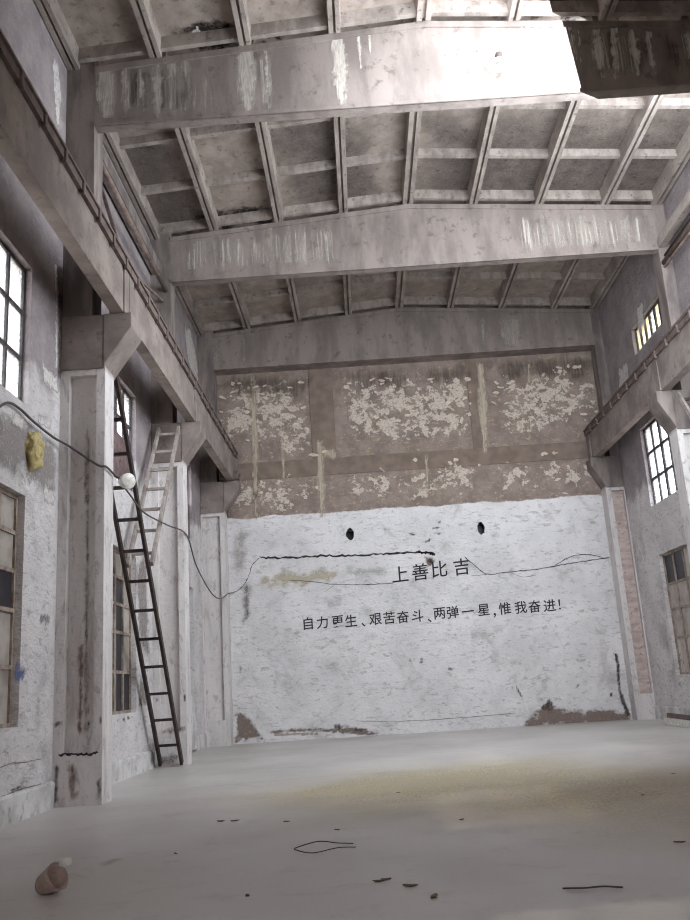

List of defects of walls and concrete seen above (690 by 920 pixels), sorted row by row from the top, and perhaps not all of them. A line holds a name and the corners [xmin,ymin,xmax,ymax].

peeling [219,379,327,458]
peeling [343,372,471,444]
peeling [491,364,598,433]
peeling [348,458,480,501]
peeling [495,451,592,498]
flaking render [525,653,630,726]
flaking render [235,713,263,743]
flaking render [272,724,376,736]